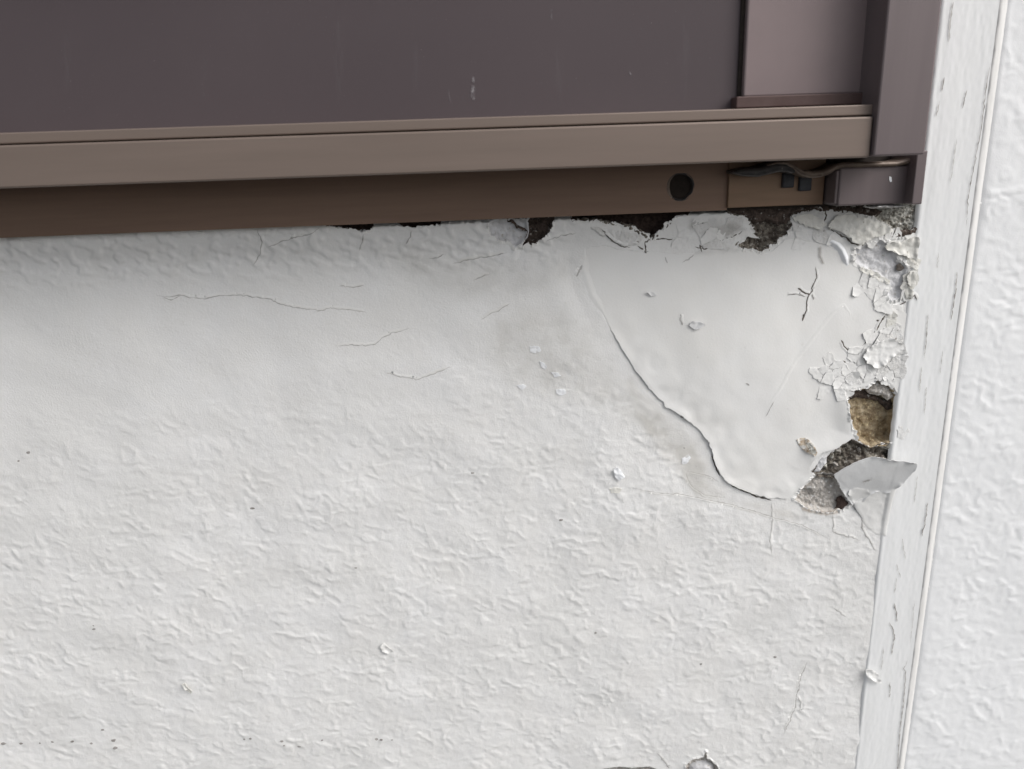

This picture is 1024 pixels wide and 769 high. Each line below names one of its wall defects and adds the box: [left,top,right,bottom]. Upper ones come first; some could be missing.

crack [254,229,317,264]
spalling [485,217,557,251]
crack [162,283,364,312]
crack [788,207,957,413]
crack [387,367,450,380]
peeling [571,212,920,515]